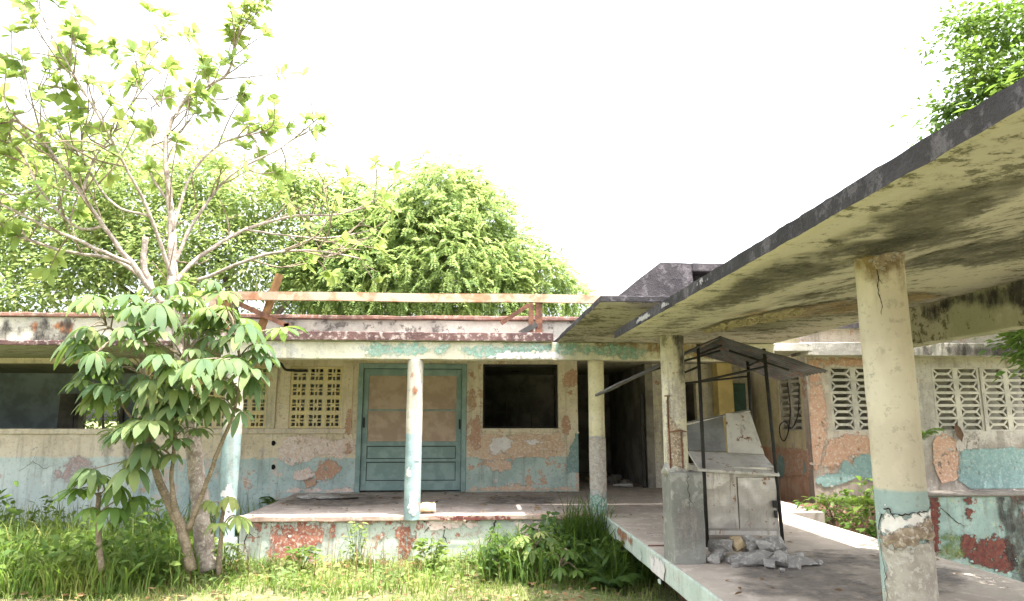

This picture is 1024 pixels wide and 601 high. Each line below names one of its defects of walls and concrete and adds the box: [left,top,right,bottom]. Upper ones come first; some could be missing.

damp [595,181,1024,376]
peeling [487,350,564,360]
peeling [270,409,355,493]
peeling [466,369,607,494]
peeling [803,358,870,487]
peeling [932,431,981,484]
peeling [353,489,541,562]
peeling [877,498,941,601]
peeling [960,497,1018,574]